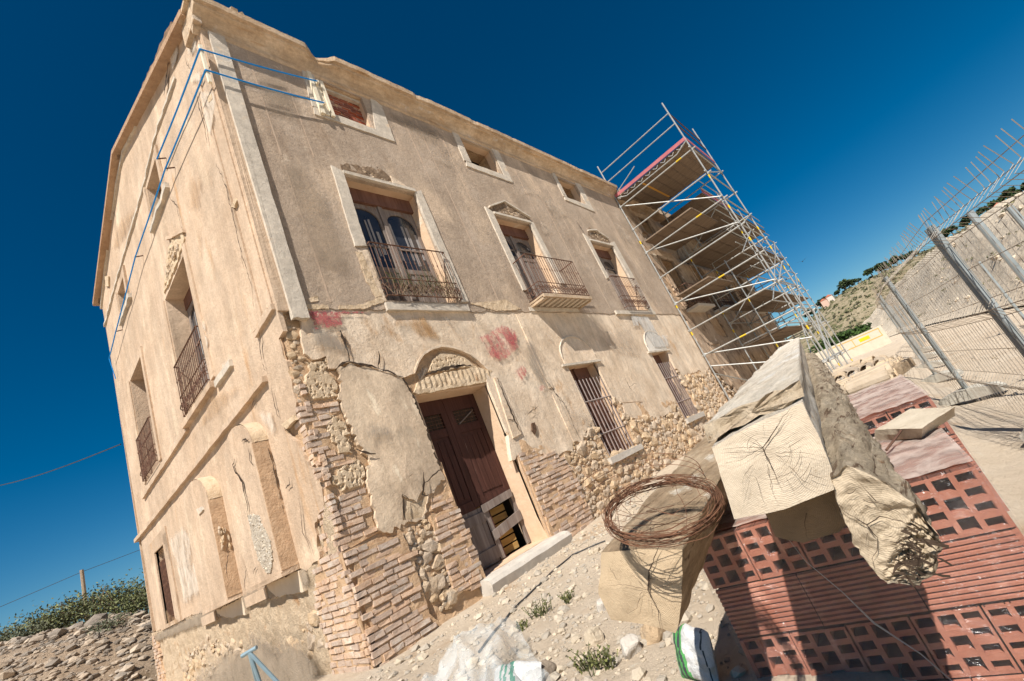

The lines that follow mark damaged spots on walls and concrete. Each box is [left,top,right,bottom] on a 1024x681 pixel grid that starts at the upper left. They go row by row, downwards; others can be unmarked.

spalling [280,326,387,552]
crack [330,318,471,466]
spalling [248,514,273,574]